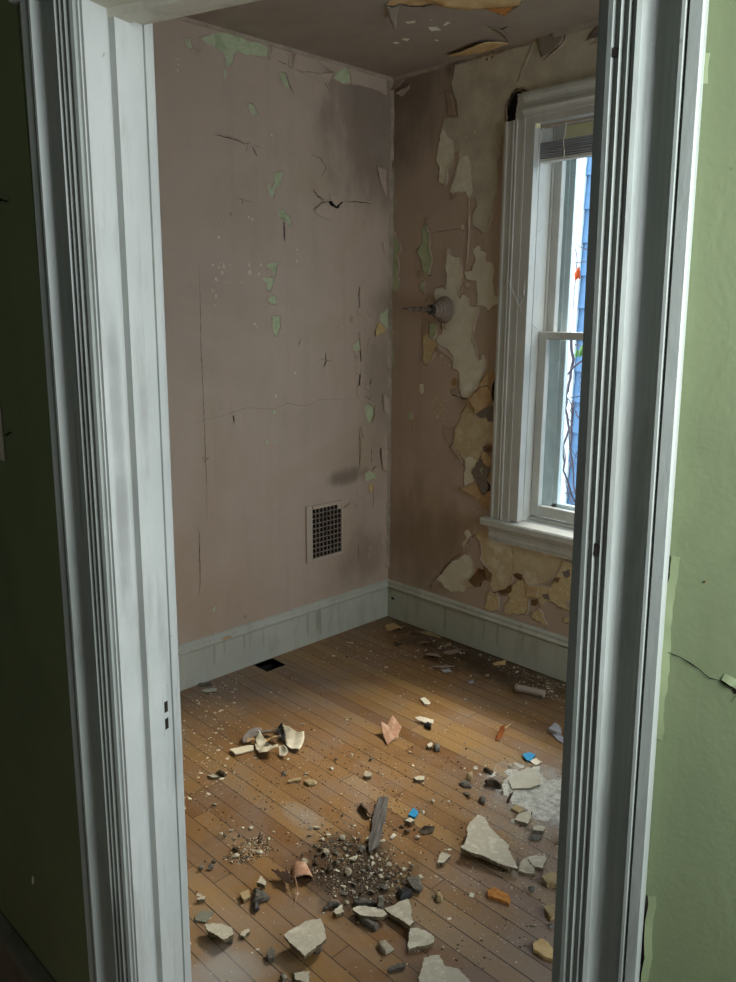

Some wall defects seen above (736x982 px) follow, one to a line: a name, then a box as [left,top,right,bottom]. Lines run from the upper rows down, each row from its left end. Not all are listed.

crack [702,53,710,84]
peeling [197,31,410,567]
spalling [422,26,598,487]
crack [193,354,337,481]
spalling [428,528,572,624]
crack [657,556,736,740]
crack [639,895,656,982]